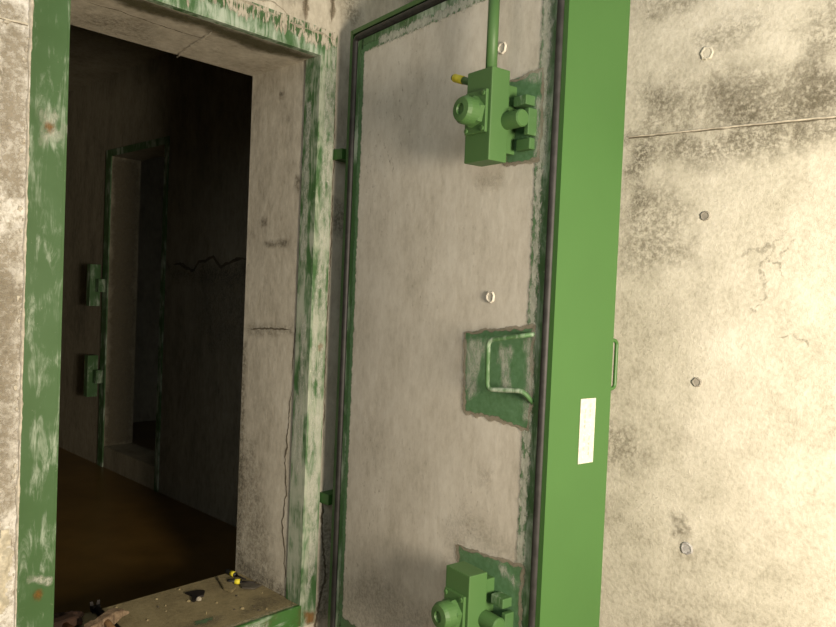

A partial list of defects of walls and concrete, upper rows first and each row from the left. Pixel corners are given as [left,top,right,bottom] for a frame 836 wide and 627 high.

leakage [0,28,28,198]
peeling [208,0,338,51]
leakage [0,231,22,514]
crack [323,116,342,453]
crack [281,393,292,580]
crack [314,503,330,627]